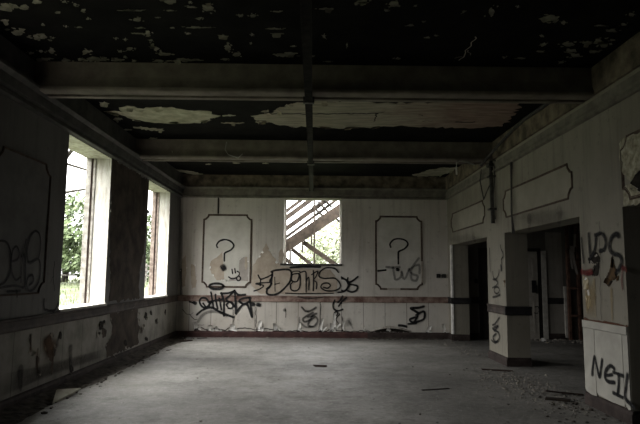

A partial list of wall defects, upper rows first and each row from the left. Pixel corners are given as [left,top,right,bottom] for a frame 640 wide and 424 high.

peeling [0,0,42,12]
peeling [170,1,216,35]
peeling [0,19,56,62]
peeling [62,9,204,65]
peeling [99,102,244,139]
peeling [251,101,522,130]
peeling [619,132,640,207]
peeling [244,244,337,295]
spalling [583,252,600,309]
spalling [604,257,619,287]
peeling [319,313,344,332]